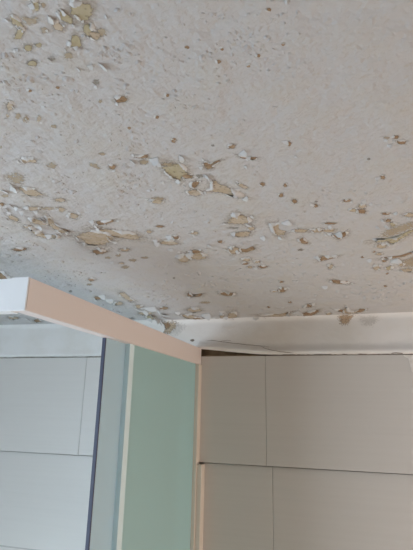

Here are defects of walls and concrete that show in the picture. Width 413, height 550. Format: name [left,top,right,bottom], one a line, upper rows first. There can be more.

peeling [5,0,45,54]
peeling [42,0,105,58]
peeling [130,154,248,202]
peeling [0,173,82,239]
peeling [75,219,164,269]
peeling [216,212,266,270]
peeling [268,220,349,251]
peeling [361,212,413,274]
peeling [93,292,211,334]
peeling [253,302,367,320]